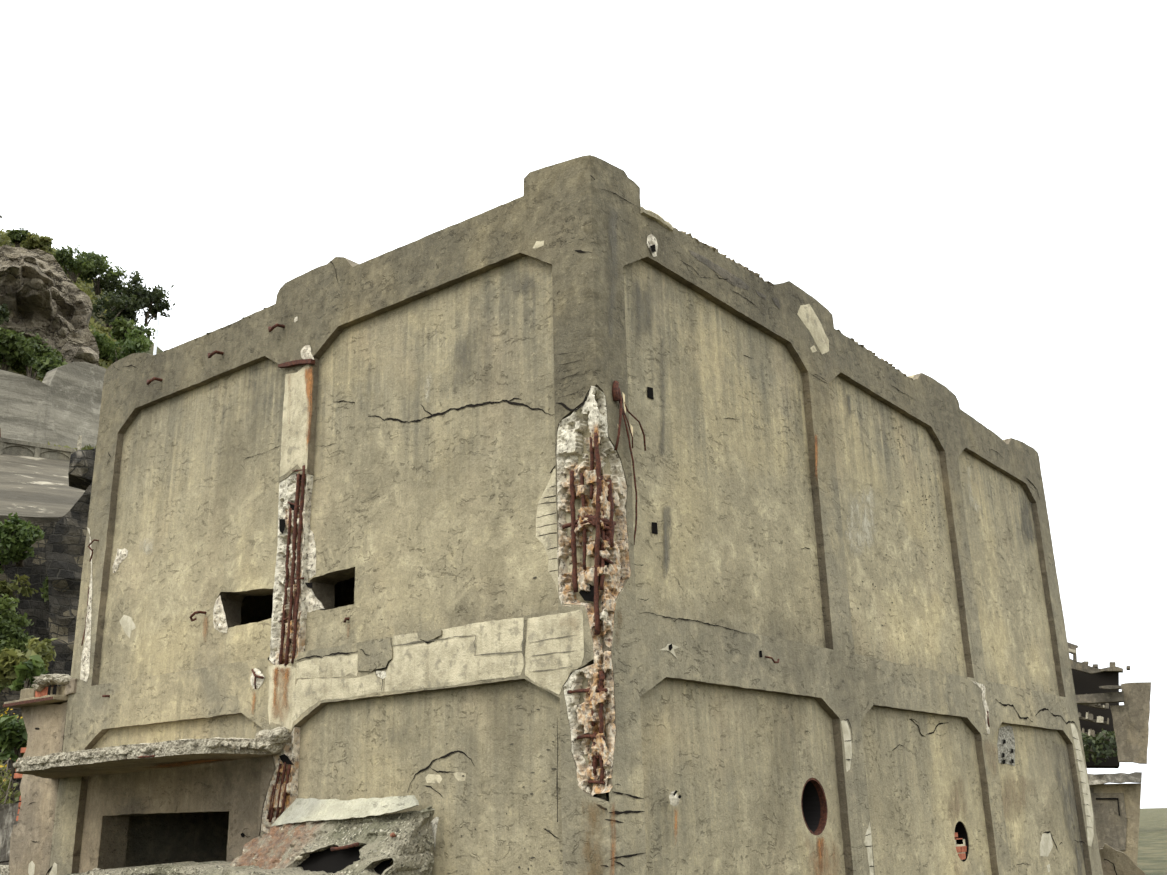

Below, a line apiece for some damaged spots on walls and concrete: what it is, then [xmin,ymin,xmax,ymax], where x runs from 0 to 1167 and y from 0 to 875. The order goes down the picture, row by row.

crack [334,352,591,423]
spalling [250,345,631,834]
crack [407,750,474,796]
spalling [431,817,439,850]
spalling [297,842,363,874]
spalling [374,859,393,875]